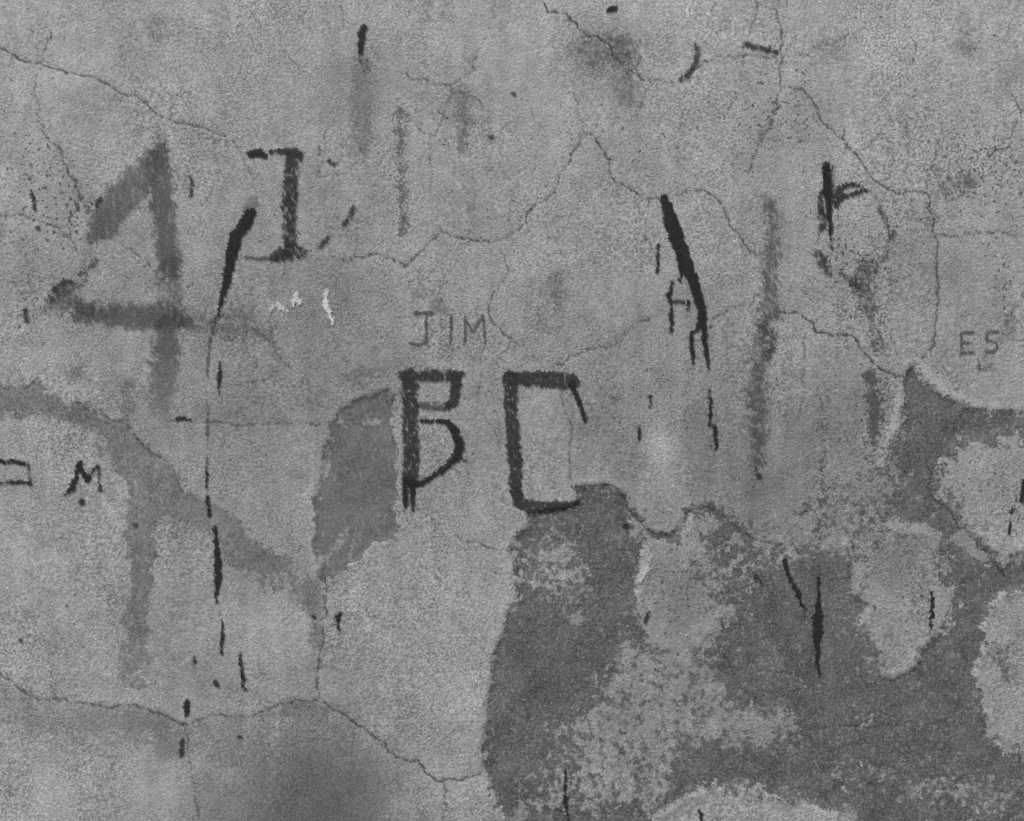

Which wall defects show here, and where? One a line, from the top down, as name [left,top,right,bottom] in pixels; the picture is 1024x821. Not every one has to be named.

crack [0,47,226,136]
crack [544,3,673,82]
crack [0,143,80,249]
crack [341,133,758,338]
crack [704,10,1007,377]
crack [544,317,650,371]
leakage [0,378,328,689]
crack [561,390,786,549]
flaking render [448,359,1024,821]
crack [926,461,1008,577]
crack [0,580,483,817]